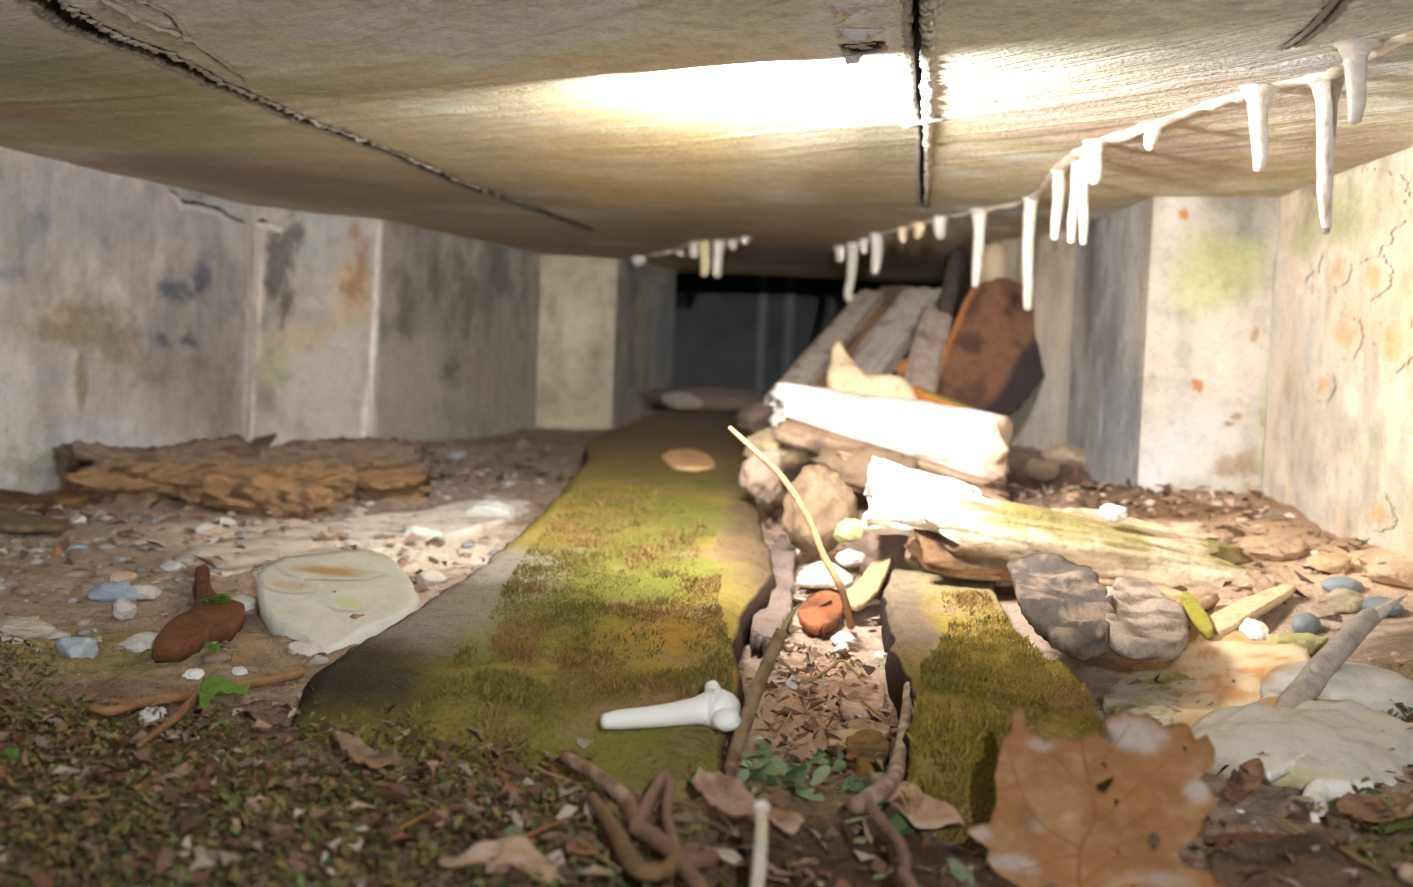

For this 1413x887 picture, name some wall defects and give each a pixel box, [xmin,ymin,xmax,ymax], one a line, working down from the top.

crack [15,0,595,233]
peeling [832,4,889,100]
crack [898,0,951,209]
leakage [1270,77,1309,89]
leakage [1324,63,1344,80]
leakage [1367,31,1413,63]
leakage [832,91,1245,250]
leakage [631,237,756,260]
leakage [0,209,524,441]